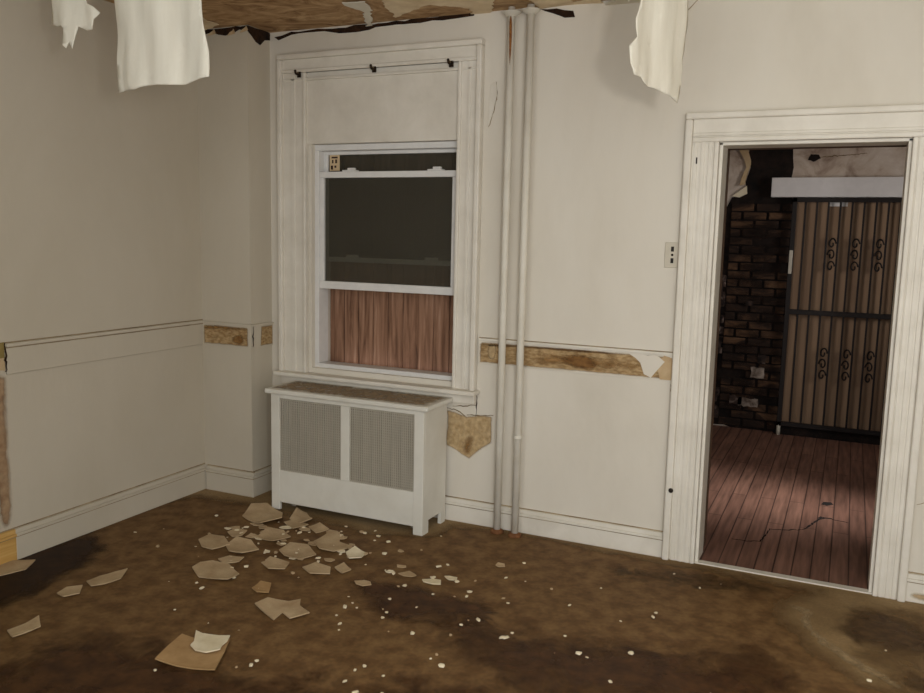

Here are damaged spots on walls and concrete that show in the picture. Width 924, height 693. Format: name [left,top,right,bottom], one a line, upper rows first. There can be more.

peeling [203,0,495,45]
peeling [529,0,603,18]
spalling [808,153,865,162]
flaking render [713,149,794,432]
peeling [204,325,272,347]
peeling [480,343,672,380]
peeling [0,342,11,525]
flaking render [446,395,493,458]
flaking render [0,559,36,576]
water stain [0,496,924,693]